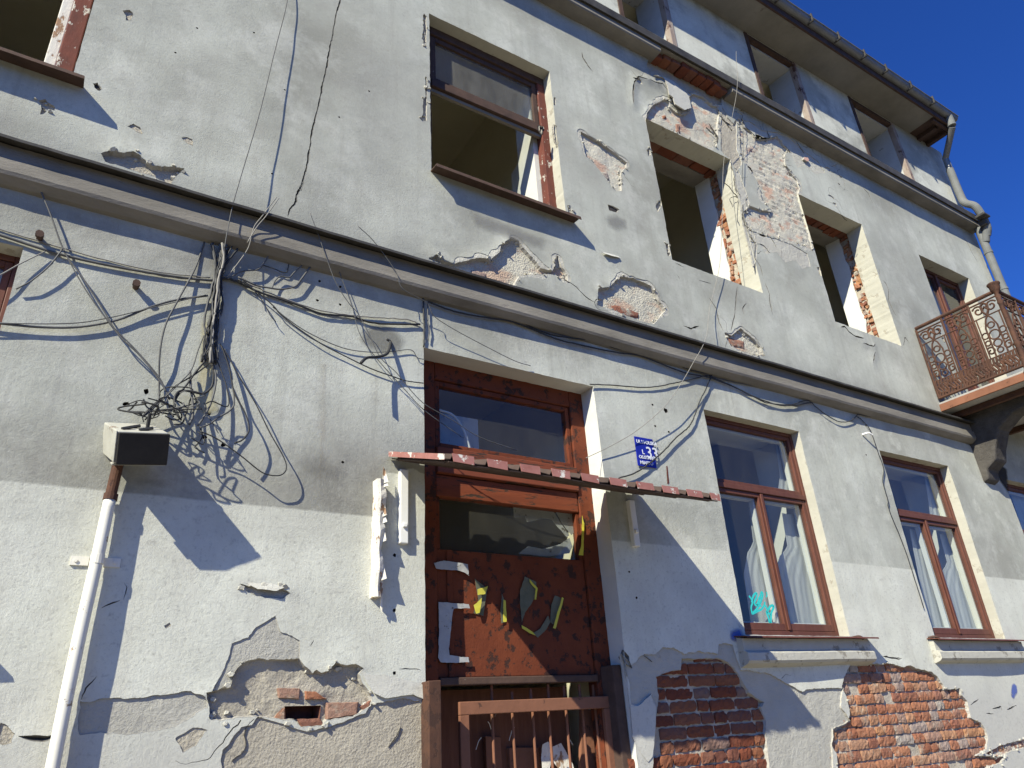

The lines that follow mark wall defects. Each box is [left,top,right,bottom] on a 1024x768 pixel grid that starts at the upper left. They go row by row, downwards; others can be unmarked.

crack [288,0,341,215]
spalling [101,147,186,184]
spalling [577,129,632,191]
spalling [632,53,847,276]
spalling [429,235,571,286]
spalling [594,272,669,325]
spalling [725,324,765,357]
peeling [78,616,423,768]
flaking render [619,643,1024,768]